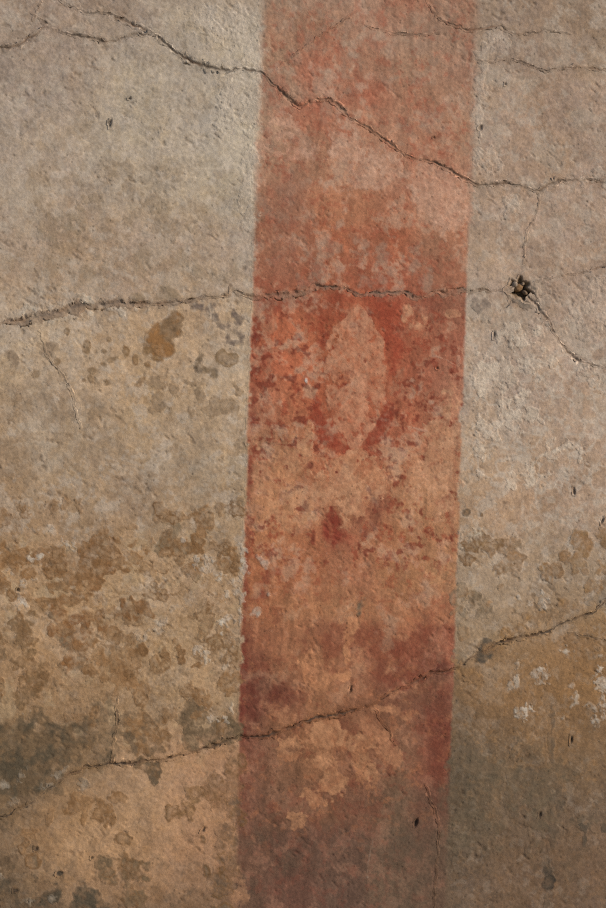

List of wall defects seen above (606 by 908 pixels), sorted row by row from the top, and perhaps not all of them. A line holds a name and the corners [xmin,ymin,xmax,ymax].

leakage [36,152,137,258]
leakage [122,189,199,244]
crack [0,0,606,430]
leakage [0,335,120,484]
leakage [3,247,248,420]
leakage [0,493,270,908]
crack [0,598,606,820]
leakage [433,654,606,908]